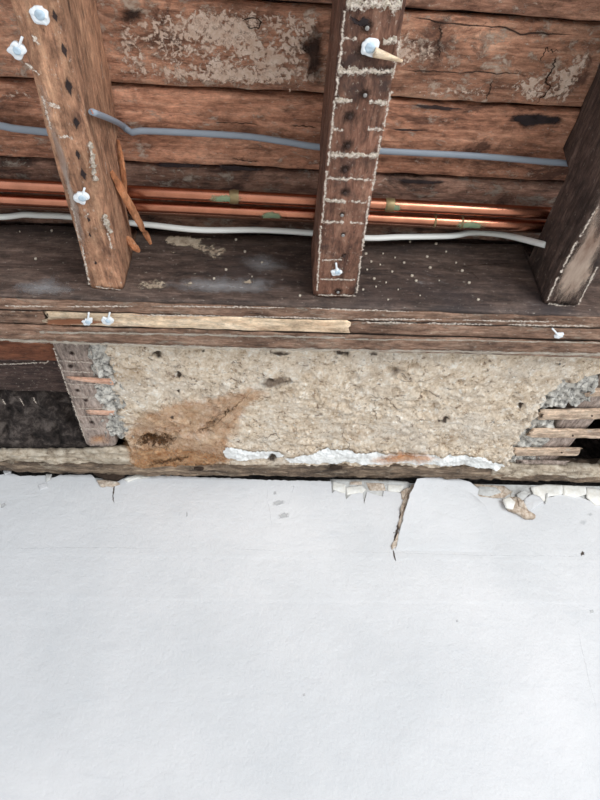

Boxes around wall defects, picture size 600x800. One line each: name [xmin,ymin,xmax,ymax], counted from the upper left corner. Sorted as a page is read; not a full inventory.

water stain [132,432,226,469]
spalling [330,479,410,500]
peeling [474,484,600,520]
crack [391,484,414,560]